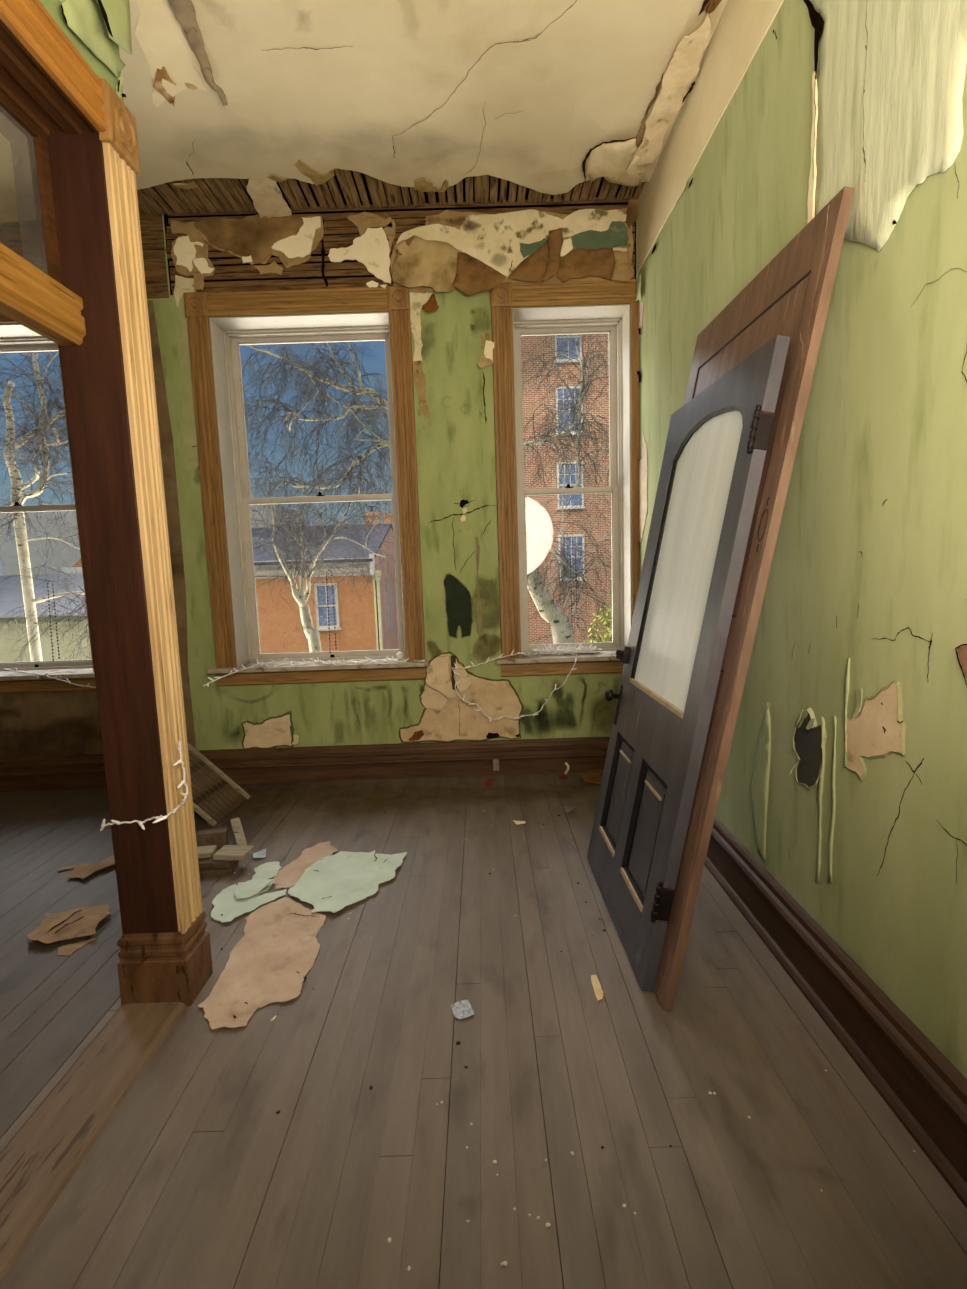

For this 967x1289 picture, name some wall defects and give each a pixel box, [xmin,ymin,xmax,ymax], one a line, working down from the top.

flaking render [135,0,721,308]
crack [392,0,577,158]
peeling [809,0,967,251]
peeling [410,292,439,419]
peeling [638,433,648,544]
peeling [241,711,299,749]
water stain [444,574,472,638]
flaking render [399,651,524,743]
peeling [793,658,907,883]
crack [879,758,924,871]
crack [874,627,932,678]
flaking render [955,644,967,685]